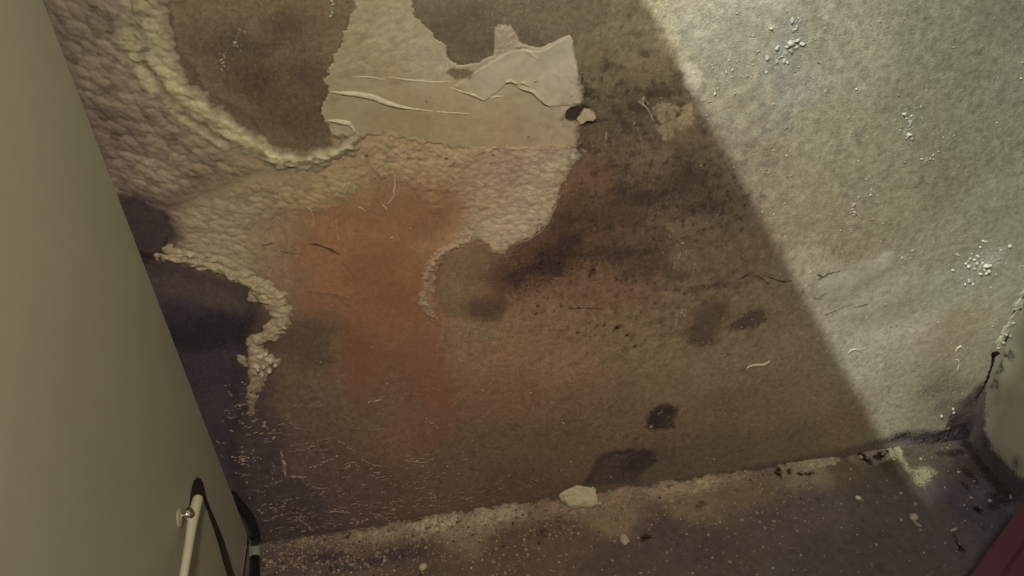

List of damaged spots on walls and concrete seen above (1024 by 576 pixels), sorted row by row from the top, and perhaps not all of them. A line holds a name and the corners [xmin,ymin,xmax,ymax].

peeling [321,0,596,216]
leakage [698,10,826,127]
leakage [437,52,745,345]
peeling [216,391,504,539]
leakage [648,405,677,429]